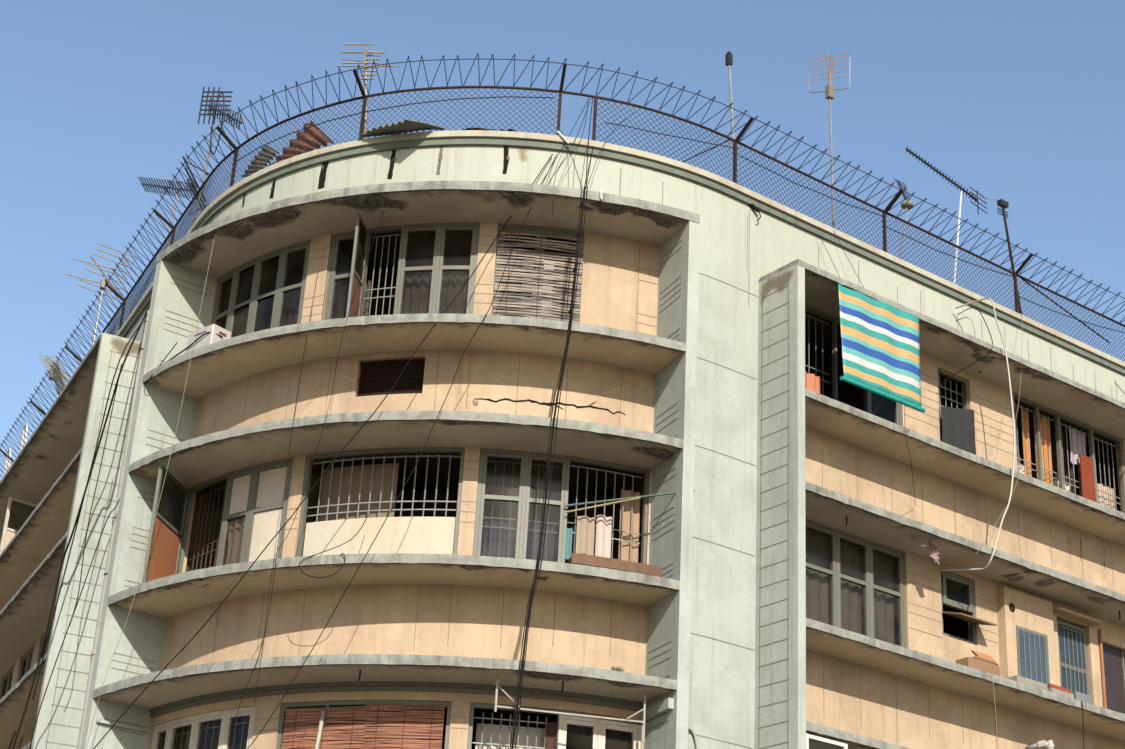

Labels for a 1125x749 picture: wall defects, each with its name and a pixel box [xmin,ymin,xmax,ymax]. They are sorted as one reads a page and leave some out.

spalling [338,195,405,211]
spalling [579,200,681,228]
spalling [165,211,300,263]
crack [476,398,626,415]